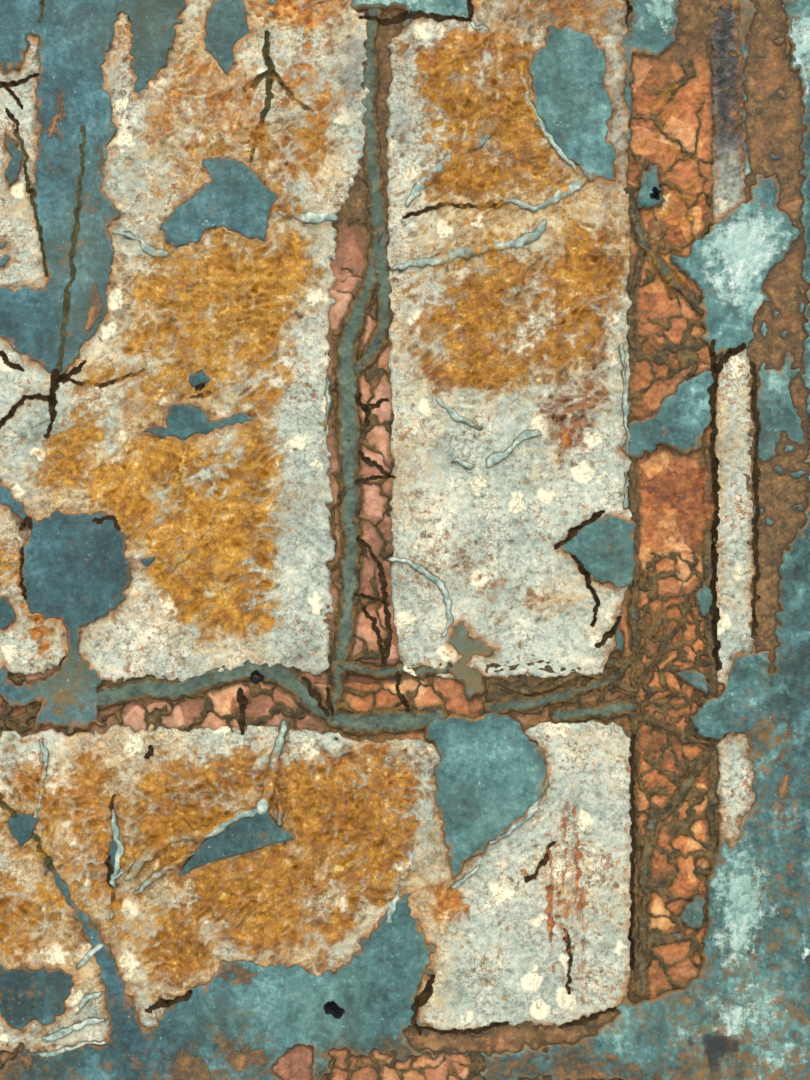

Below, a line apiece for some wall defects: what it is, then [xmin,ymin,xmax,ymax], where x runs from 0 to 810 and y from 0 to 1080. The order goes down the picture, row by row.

crack [0,73,146,439]
peeling [0,0,372,702]
rust [27,0,347,644]
peeling [342,0,810,732]
rust [641,464,715,542]
crack [354,535,410,712]
rust [171,1049,213,1080]
peeling [0,680,756,1080]
crack [411,975,509,1036]
rust [485,1048,663,1080]
crack [559,928,616,1029]
crack [628,735,637,969]